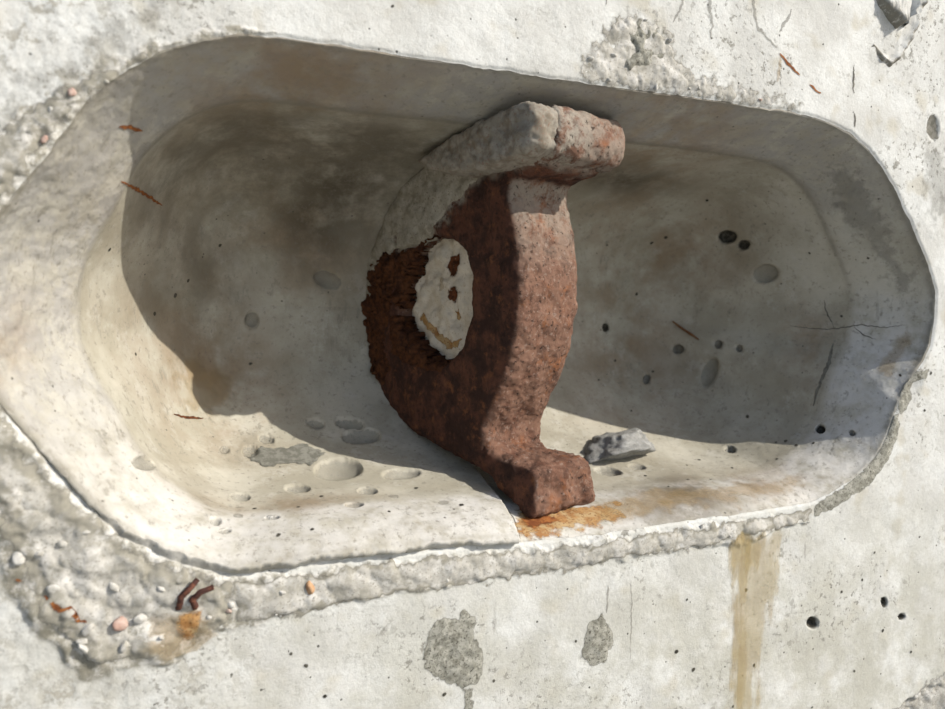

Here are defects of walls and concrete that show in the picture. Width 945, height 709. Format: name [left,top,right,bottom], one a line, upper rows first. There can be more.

spalling [581,11,801,111]
spalling [0,47,152,196]
rust [420,313,462,349]
rust [447,254,461,320]
crack [790,301,893,406]
spalling [0,369,929,666]
rust [515,501,626,538]
spalling [897,672,945,709]